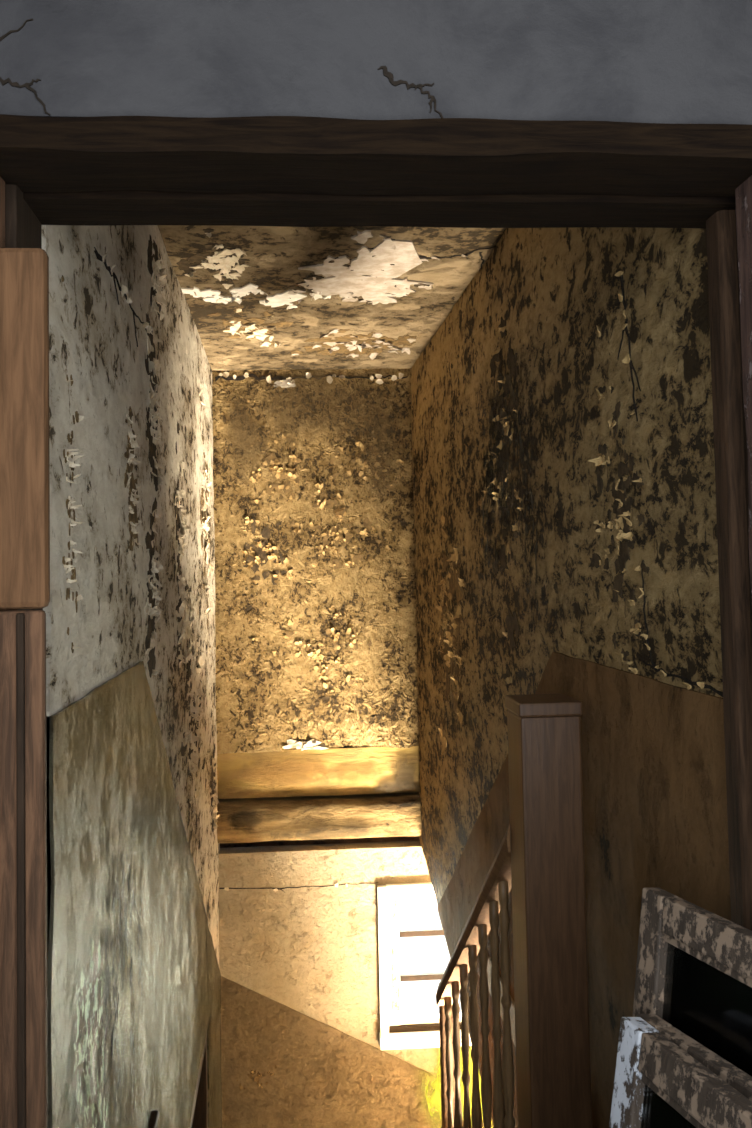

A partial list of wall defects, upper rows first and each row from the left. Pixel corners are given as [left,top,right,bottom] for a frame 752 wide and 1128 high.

crack [0,19,33,41]
crack [0,77,50,116]
crack [378,66,443,118]
damp [477,356,541,624]
flaking render [124,228,433,852]